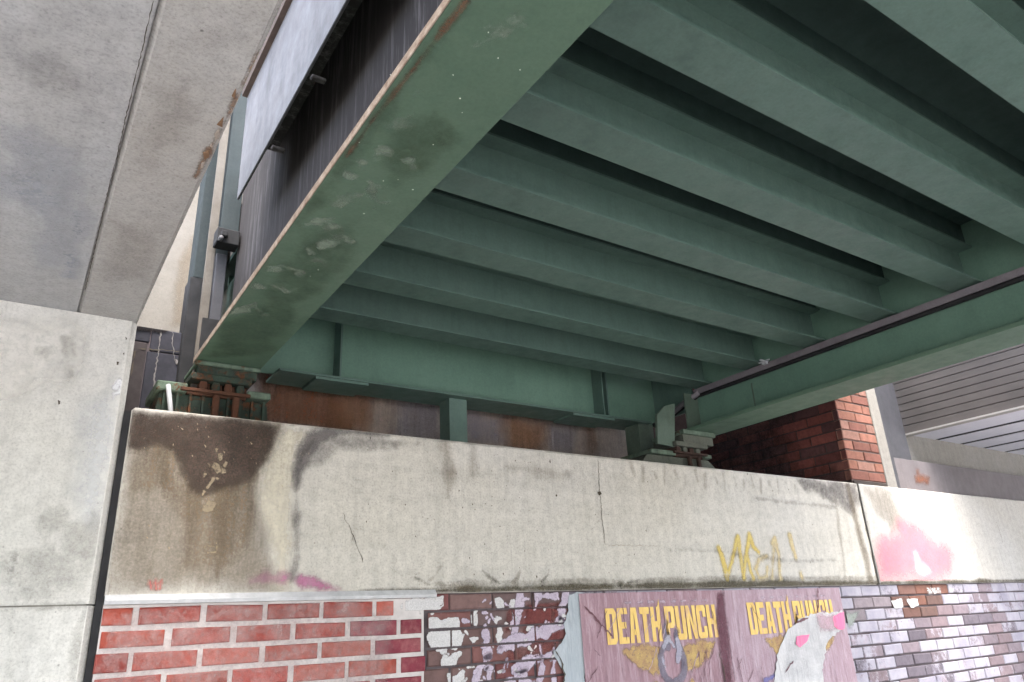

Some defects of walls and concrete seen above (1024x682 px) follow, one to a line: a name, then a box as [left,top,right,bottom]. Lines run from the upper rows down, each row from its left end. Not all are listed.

corrosion [193,0,470,363]
corrosion [511,416,540,450]
leakage [118,411,383,585]
crack [598,462,649,547]
peeling [400,596,479,682]
peeling [494,597,515,643]